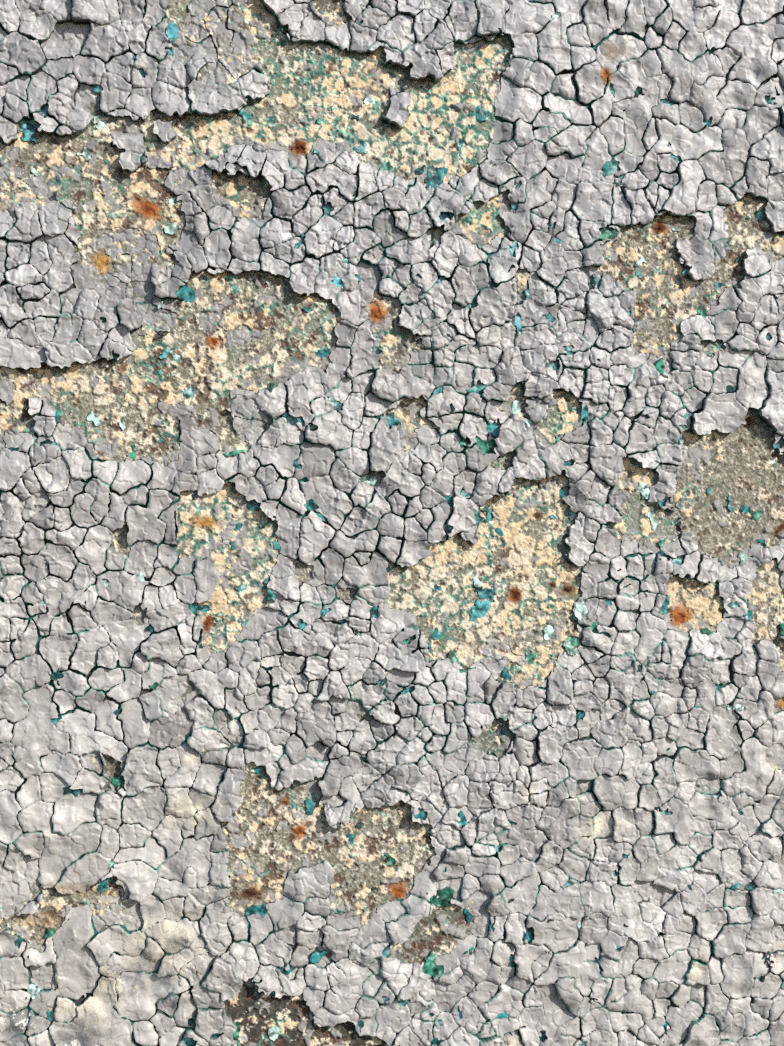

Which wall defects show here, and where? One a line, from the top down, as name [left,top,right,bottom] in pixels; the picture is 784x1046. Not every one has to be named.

rust [132,198,162,220]
peeling [0,0,513,274]
crack [201,165,416,271]
crack [494,6,673,159]
peeling [0,270,342,467]
rust [370,300,388,322]
crack [253,381,475,602]
crack [0,446,758,863]
peeling [370,380,610,690]
rust [670,605,693,626]
peeling [220,761,436,928]
peeling [224,978,400,1046]